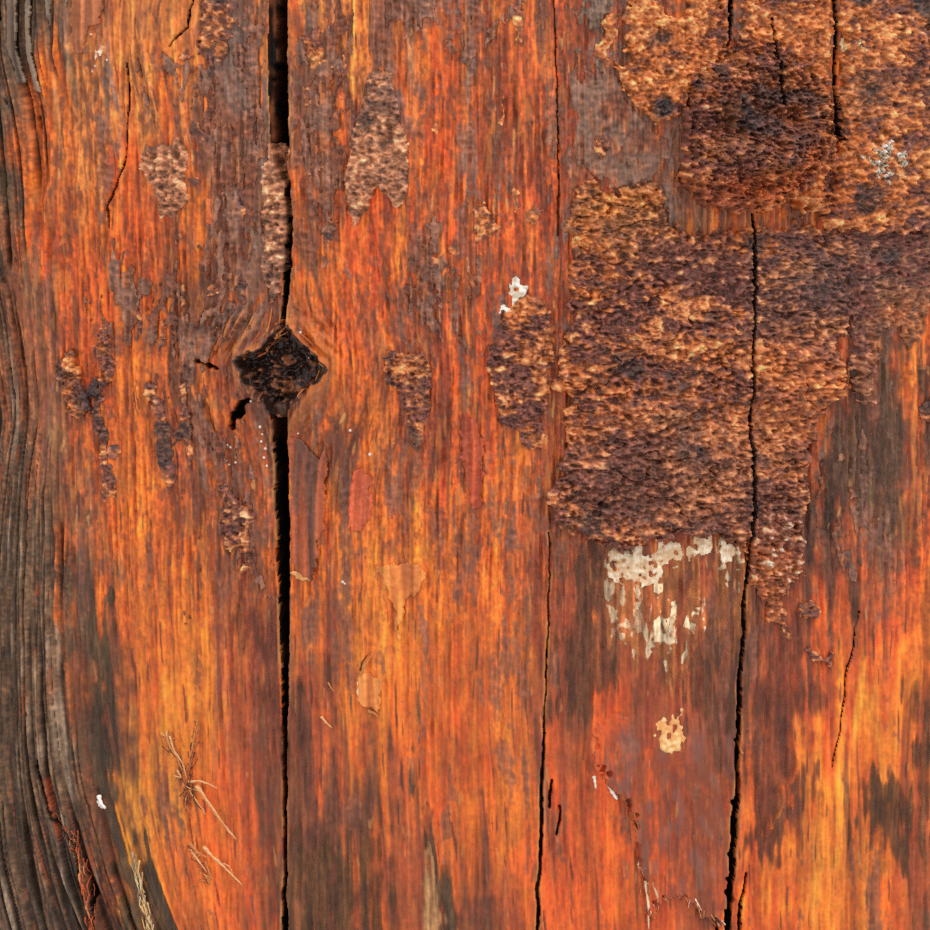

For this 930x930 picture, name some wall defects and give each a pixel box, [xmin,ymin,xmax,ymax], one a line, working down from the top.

crack [268,0,290,146]
crack [552,0,560,235]
crack [725,0,733,47]
crack [770,17,788,107]
crack [832,0,849,143]
crack [281,182,293,319]
crack [231,398,251,430]
crack [270,414,291,930]
crack [535,532,561,930]
water stain [542,533,745,727]
crack [714,214,759,930]